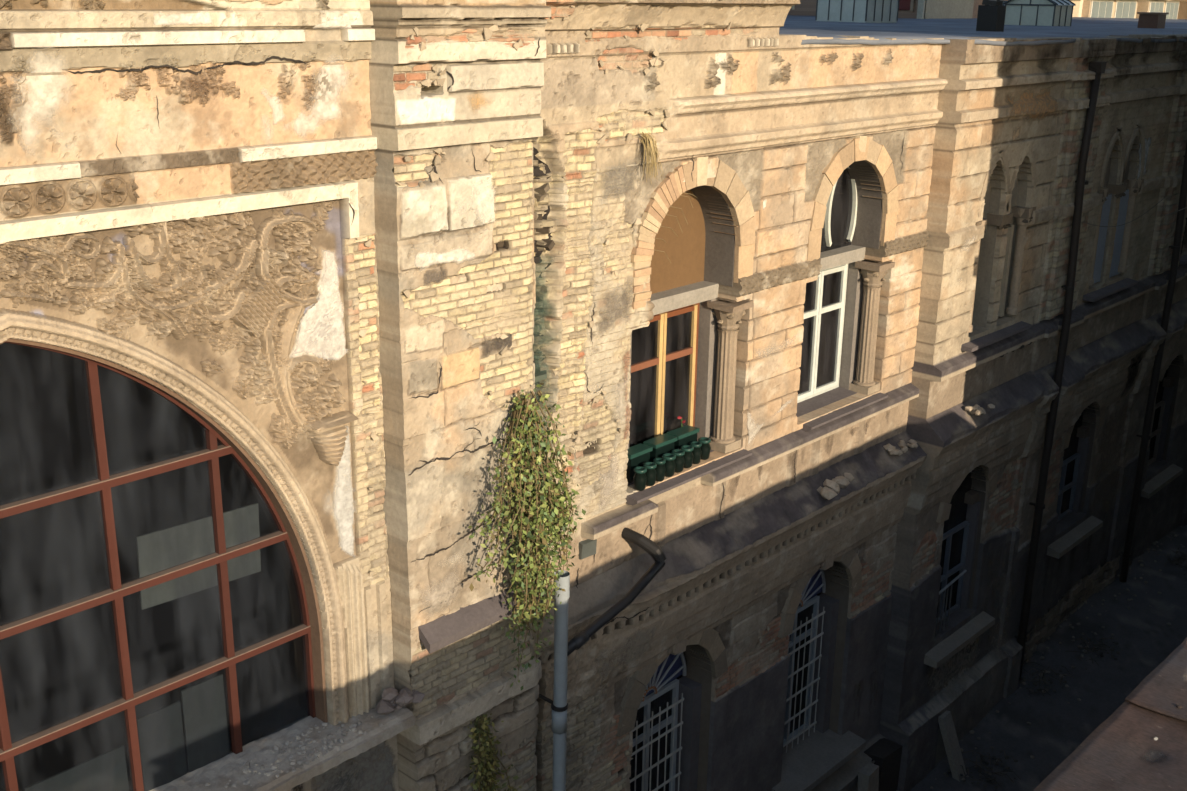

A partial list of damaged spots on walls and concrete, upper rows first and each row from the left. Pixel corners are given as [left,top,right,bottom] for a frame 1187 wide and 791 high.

crack [66,56,309,75]
spalling [393,25,534,91]
spalling [539,108,670,508]
spalling [295,236,386,577]
crack [412,520,494,562]